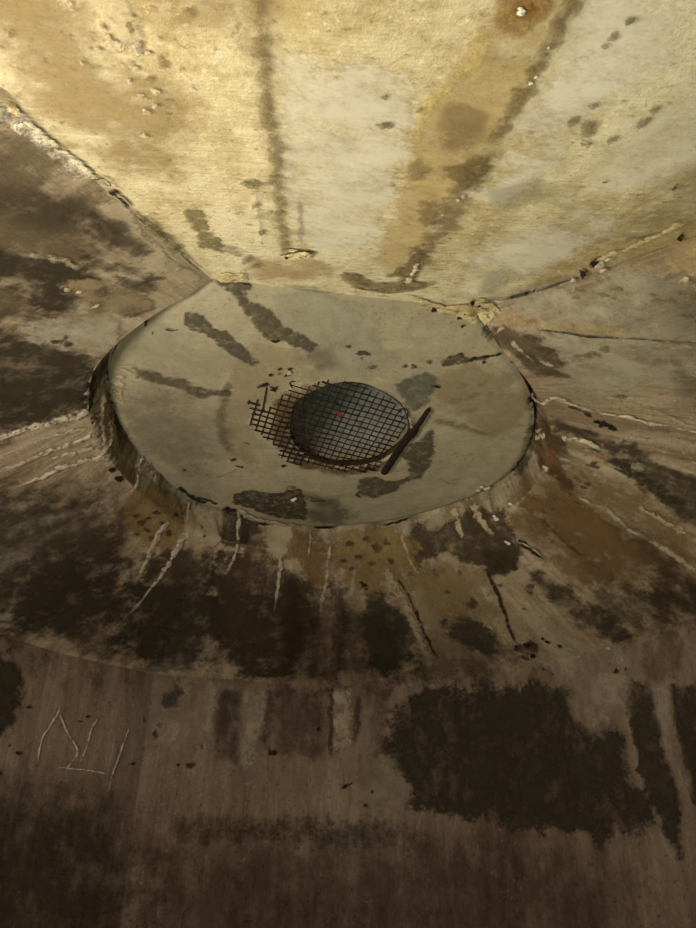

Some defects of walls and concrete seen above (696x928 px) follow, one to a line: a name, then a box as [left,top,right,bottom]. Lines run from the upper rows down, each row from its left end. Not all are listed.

leakage [240,0,409,252]
corrosion [376,44,530,274]
corrosion [493,0,567,43]
leakage [493,0,668,148]
leakage [0,92,199,446]
leakage [183,210,223,252]
leakage [184,313,259,366]
leakage [216,281,386,374]
crack [488,224,682,303]
leakage [482,269,696,399]
leakage [0,420,696,860]
crack [487,572,515,641]